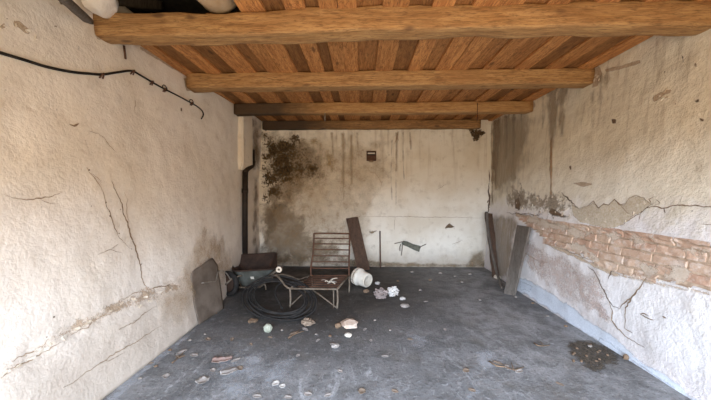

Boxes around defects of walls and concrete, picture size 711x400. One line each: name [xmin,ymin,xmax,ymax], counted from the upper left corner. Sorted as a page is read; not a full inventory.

flaking render [1,285,180,378]
crack [63,168,170,388]
damp [253,130,339,265]
damp [491,116,527,188]
flaking render [507,183,711,294]
crack [590,268,666,347]
crack [639,197,711,219]